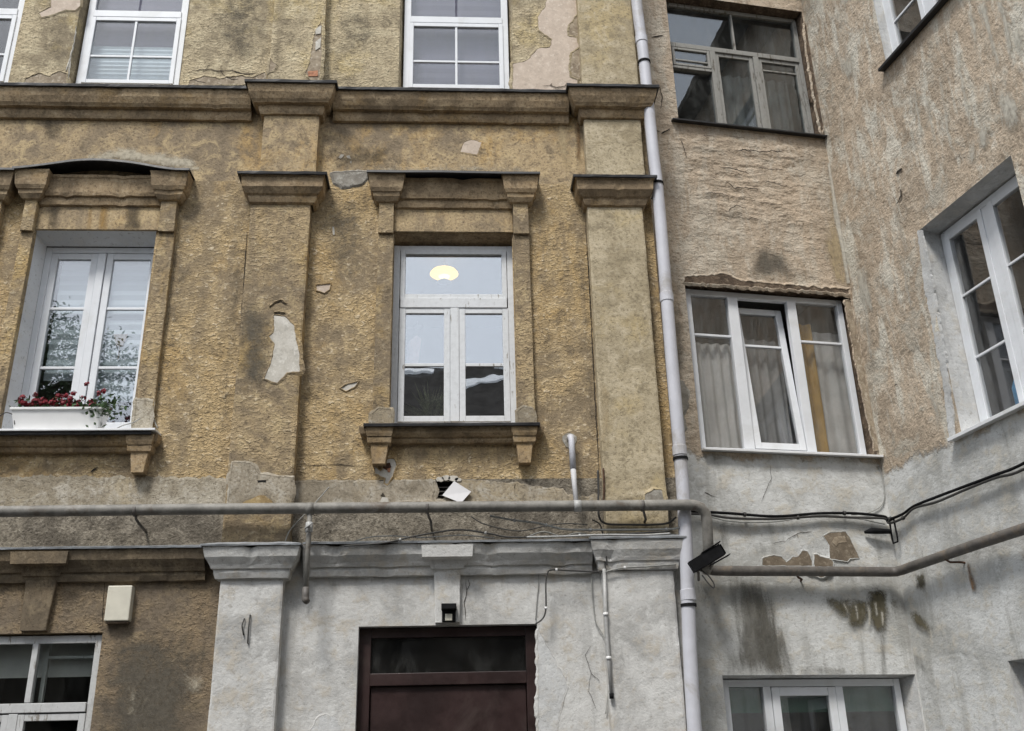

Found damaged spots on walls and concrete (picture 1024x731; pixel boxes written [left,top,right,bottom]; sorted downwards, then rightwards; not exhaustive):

flaking render [37,0,83,19]
crack [184,64,253,83]
flaking render [303,20,325,80]
flaking render [508,0,581,90]
peeling [332,154,367,186]
damp [756,251,788,273]
flaking render [262,314,305,385]
peeling [0,456,597,506]
peeling [761,531,860,579]
damp [738,584,789,668]